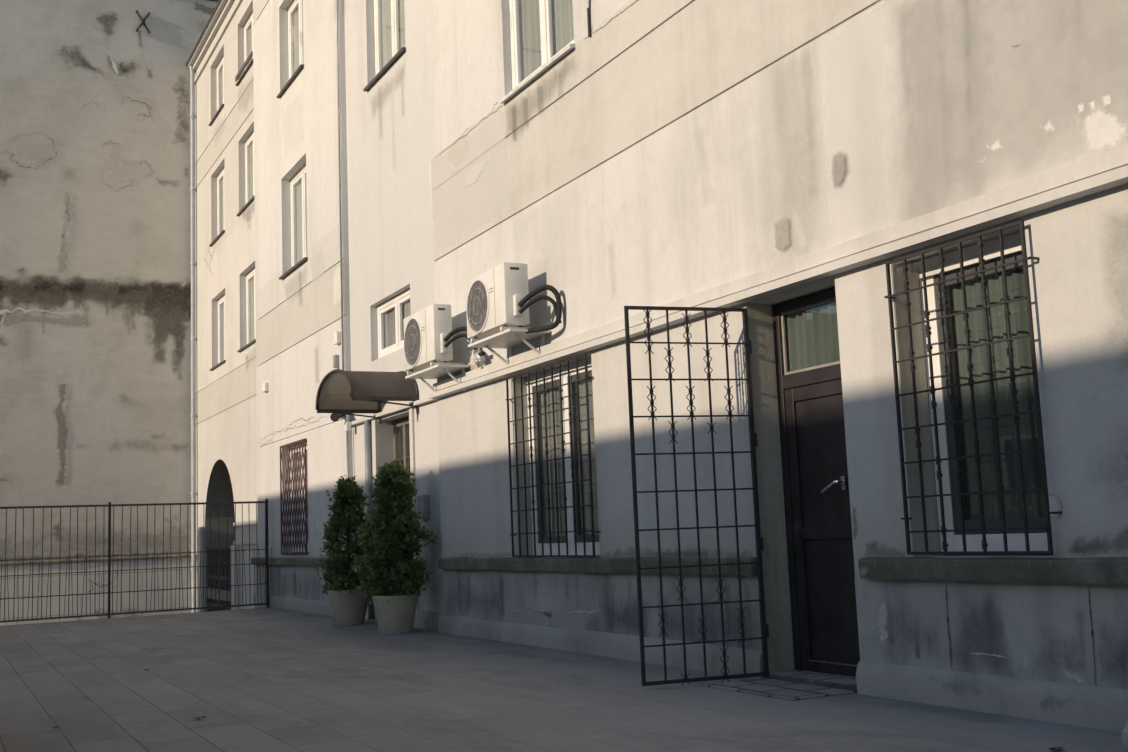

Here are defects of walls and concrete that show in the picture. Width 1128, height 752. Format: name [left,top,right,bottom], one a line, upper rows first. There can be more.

water stain [914,0,1128,173]
peeling [1078,95,1126,150]
water stain [0,269,191,370]